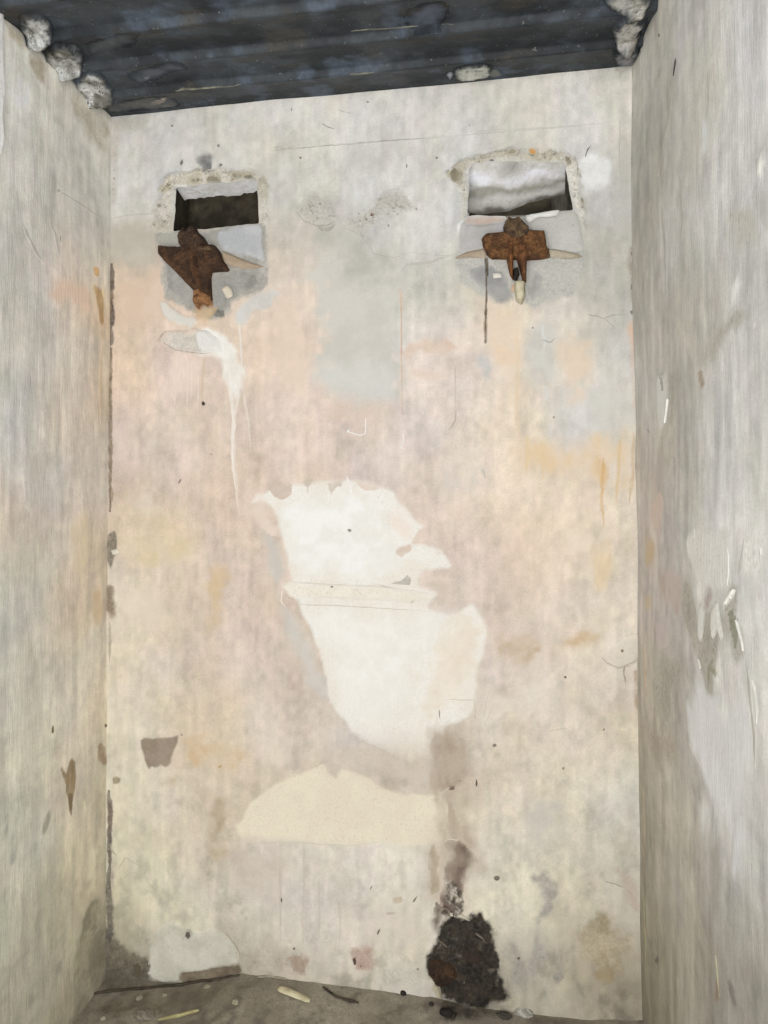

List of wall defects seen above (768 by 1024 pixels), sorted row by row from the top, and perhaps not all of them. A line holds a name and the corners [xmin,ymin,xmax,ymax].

spalling [149,164,281,357]
spalling [435,146,591,313]
damp [523,66,636,481]
efflorescence [167,324,252,515]
peeling [263,475,496,765]
peeling [140,733,186,791]
peeling [235,763,434,849]
damp [456,847,479,868]